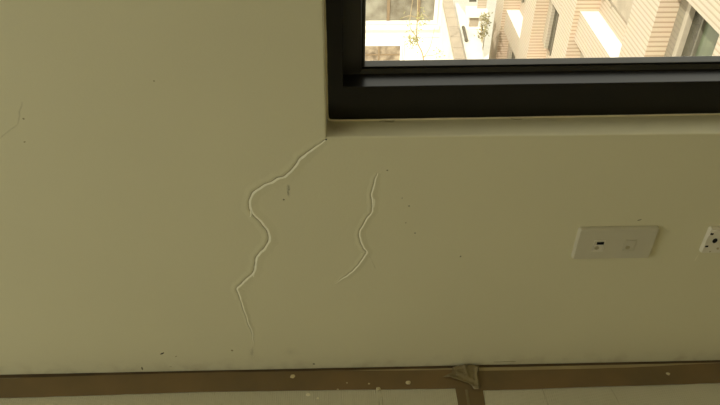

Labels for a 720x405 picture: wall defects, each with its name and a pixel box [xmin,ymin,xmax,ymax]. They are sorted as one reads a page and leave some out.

crack [230,137,329,356]
crack [335,172,381,284]